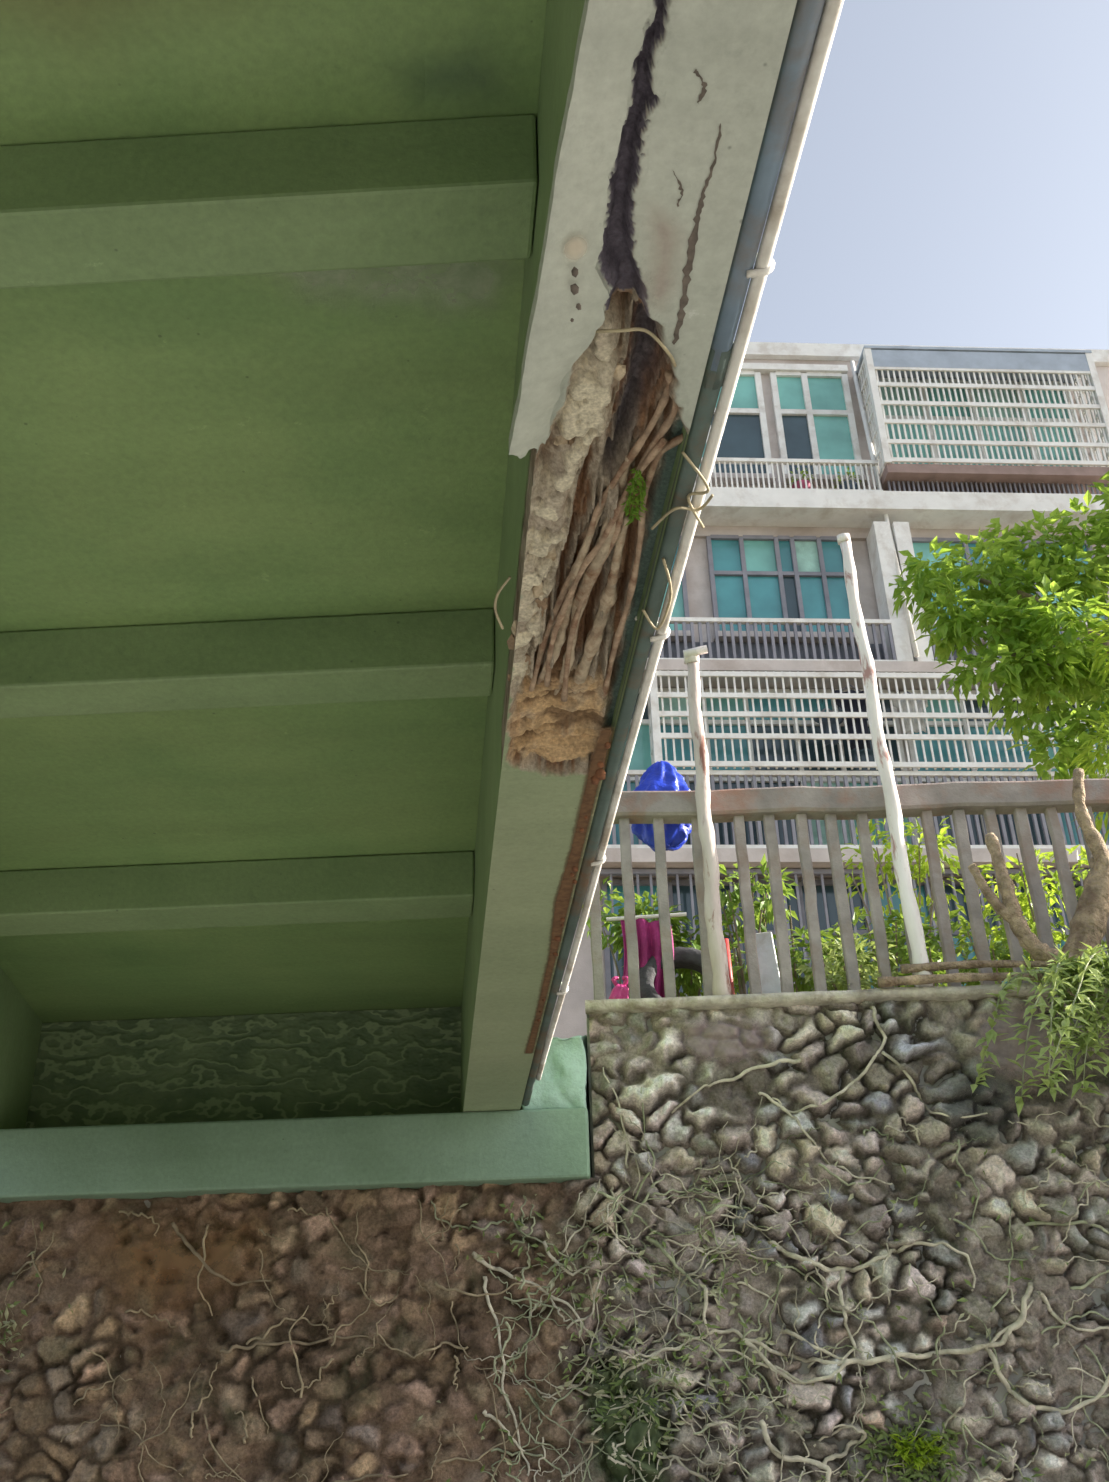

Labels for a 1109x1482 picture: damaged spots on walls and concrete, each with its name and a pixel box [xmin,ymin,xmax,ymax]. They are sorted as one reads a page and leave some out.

crack [596,0,722,345]
spalling [494,267,714,782]